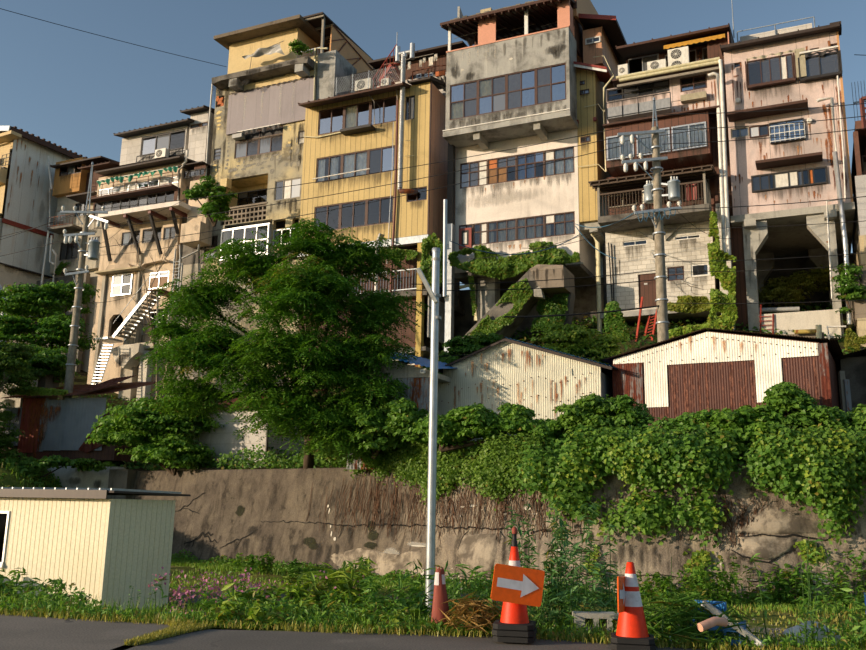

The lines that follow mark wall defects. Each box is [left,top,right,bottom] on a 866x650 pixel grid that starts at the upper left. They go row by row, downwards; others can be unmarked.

rust [809,87,849,188]
rust [465,349,543,403]
rust [550,376,586,416]
crack [178,493,586,549]
crack [731,533,840,588]